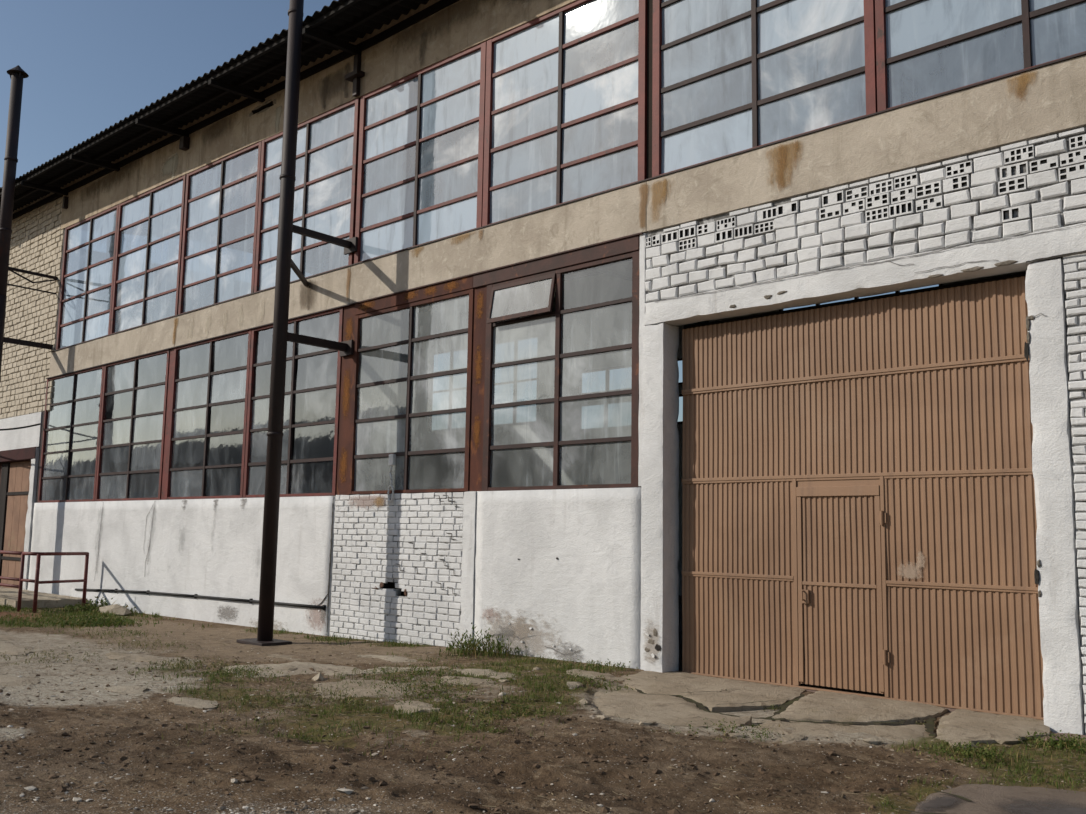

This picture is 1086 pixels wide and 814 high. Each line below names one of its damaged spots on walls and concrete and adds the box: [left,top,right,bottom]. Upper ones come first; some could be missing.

rust [771,143,800,186]
rust [640,179,666,227]
spalling [375,542,458,597]
spalling [644,628,661,658]
crack [635,688,936,736]